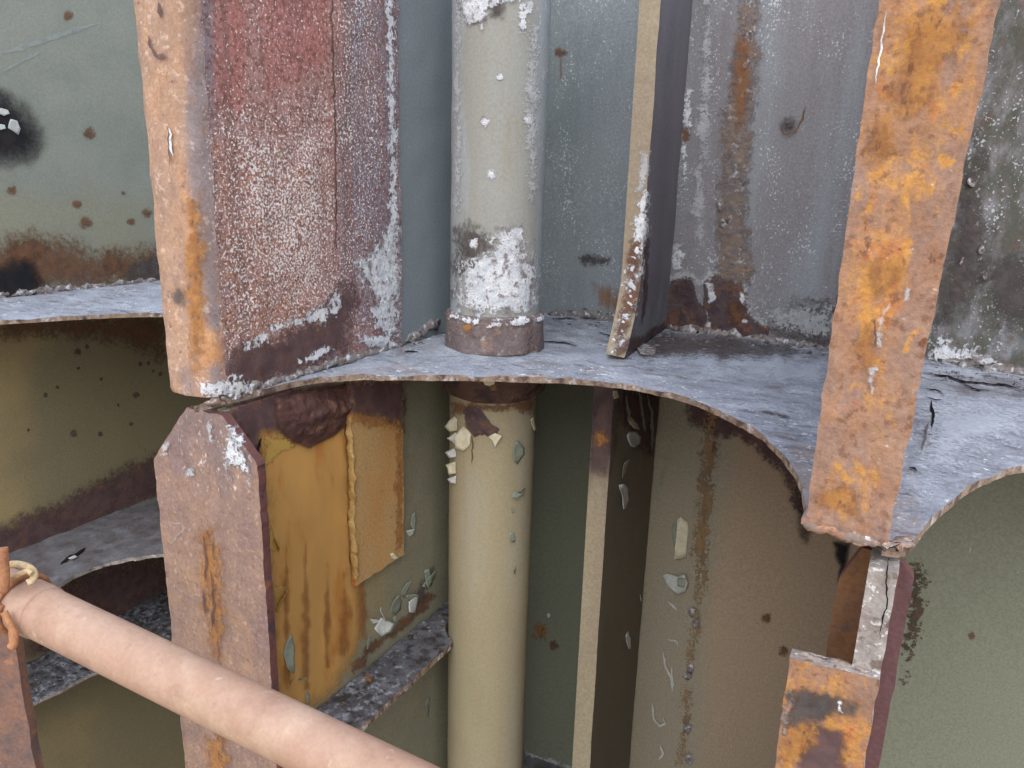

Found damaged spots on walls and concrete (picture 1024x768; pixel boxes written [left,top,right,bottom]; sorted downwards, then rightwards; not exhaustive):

efflorescence [353,0,512,377]
rust [0,229,160,298]
rust [181,198,208,371]
efflorescence [450,224,611,358]
rust [601,233,666,356]
rust [196,527,226,664]
rust [225,281,436,707]
peeling [367,567,436,649]
peeling [444,407,502,484]
peeling [662,574,688,610]
peeling [671,517,689,560]
crack [879,558,889,638]